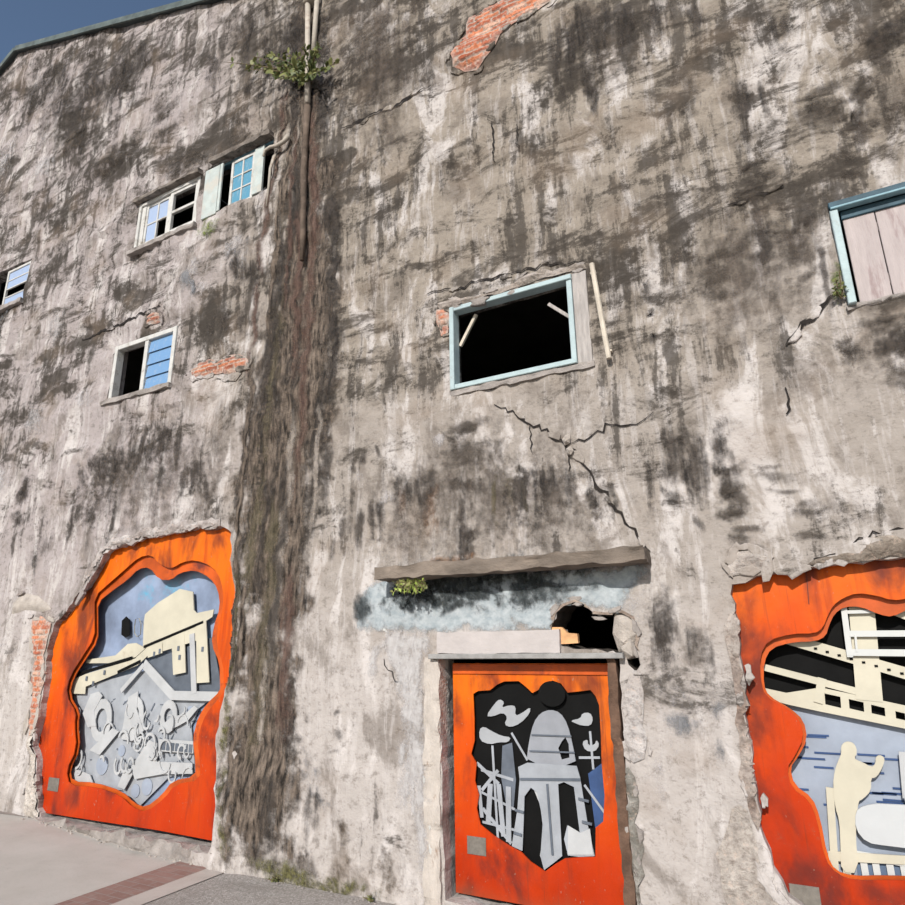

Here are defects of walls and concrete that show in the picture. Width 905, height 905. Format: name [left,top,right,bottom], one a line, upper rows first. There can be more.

flaking render [443,0,556,76]
crack [342,85,431,128]
crack [785,294,835,346]
leakage [863,295,905,355]
leakage [79,426,208,531]
leakage [211,0,343,875]
leakage [355,496,387,543]
crack [494,404,653,551]
crack [784,387,792,414]
flaking render [22,616,55,818]
peeling [353,564,645,868]
spalling [622,670,652,905]